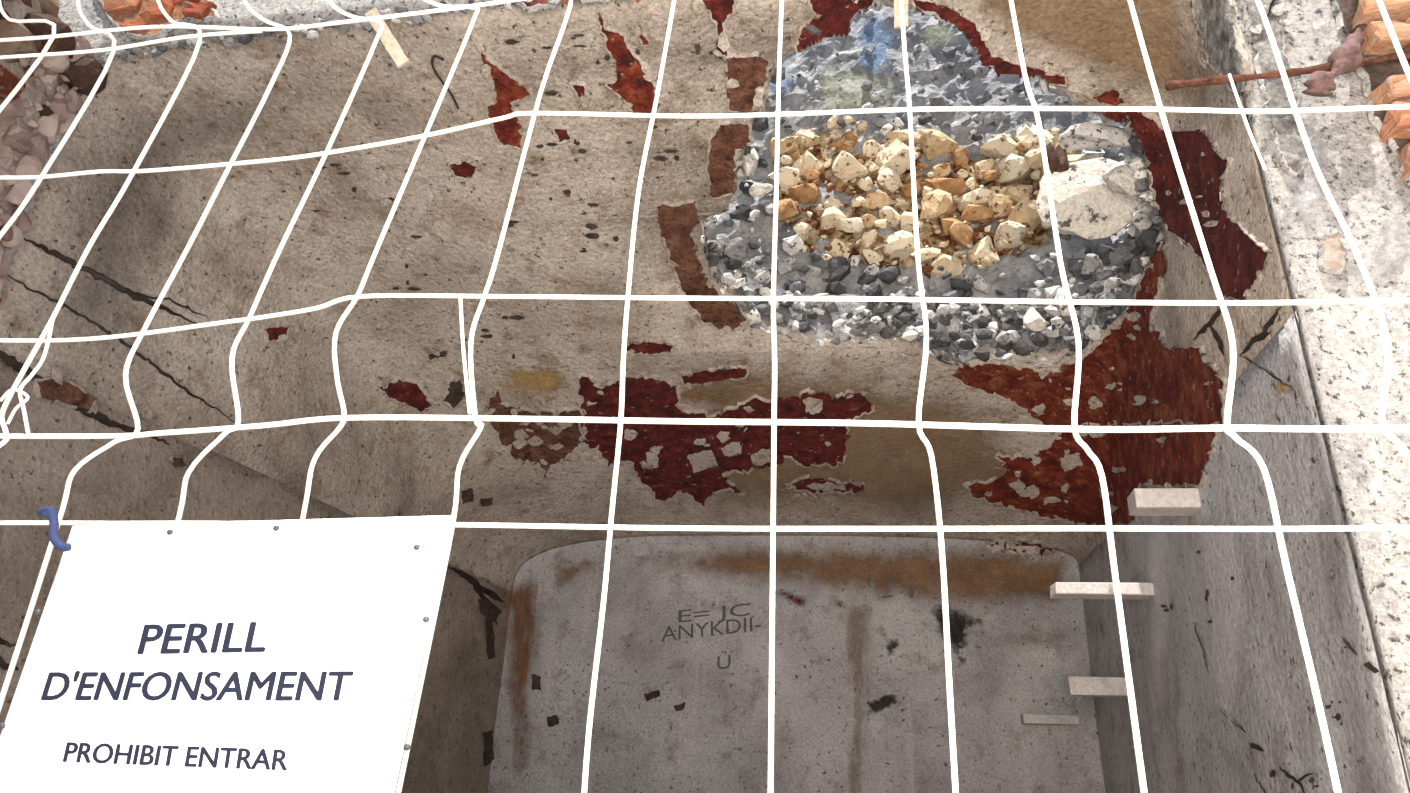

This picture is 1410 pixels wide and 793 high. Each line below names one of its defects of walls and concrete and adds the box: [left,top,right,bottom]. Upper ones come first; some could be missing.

peeling [87,0,659,179]
crack [24,237,207,323]
spalling [579,203,619,253]
peeling [653,0,1272,526]
crack [0,350,43,383]
crack [7,274,235,423]
crack [73,407,171,445]
peeling [374,375,466,412]
peeling [484,339,875,508]
crack [1193,306,1294,391]
corrosion [697,553,1061,598]
corrosion [509,585,535,714]